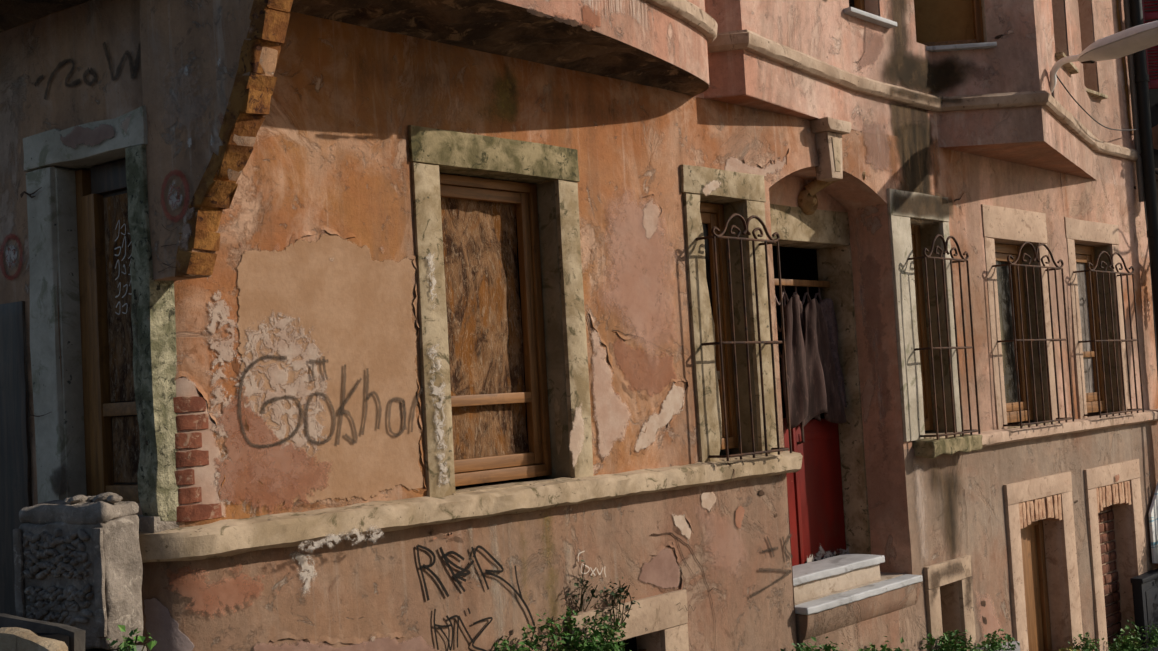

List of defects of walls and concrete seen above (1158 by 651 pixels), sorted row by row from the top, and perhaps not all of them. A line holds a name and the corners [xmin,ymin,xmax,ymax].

spalling [175,0,293,278]
damp [864,0,972,223]
peeling [173,225,427,525]